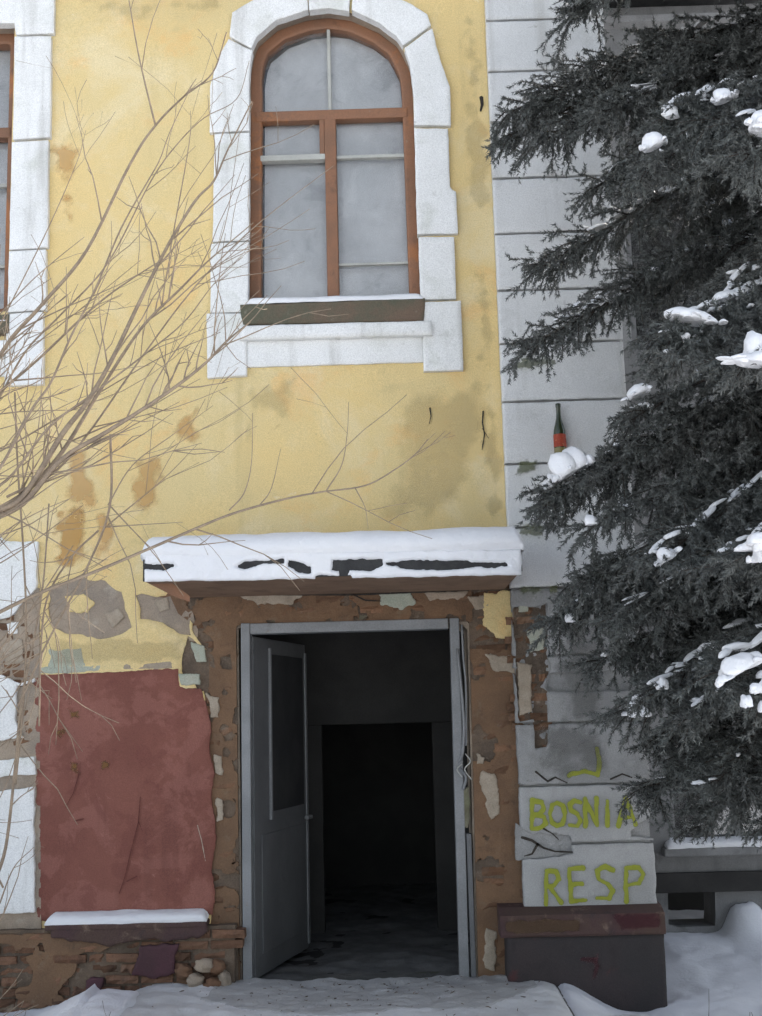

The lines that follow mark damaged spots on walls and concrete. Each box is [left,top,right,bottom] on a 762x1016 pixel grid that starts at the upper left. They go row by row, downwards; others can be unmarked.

flaking render [0,578,572,1012]